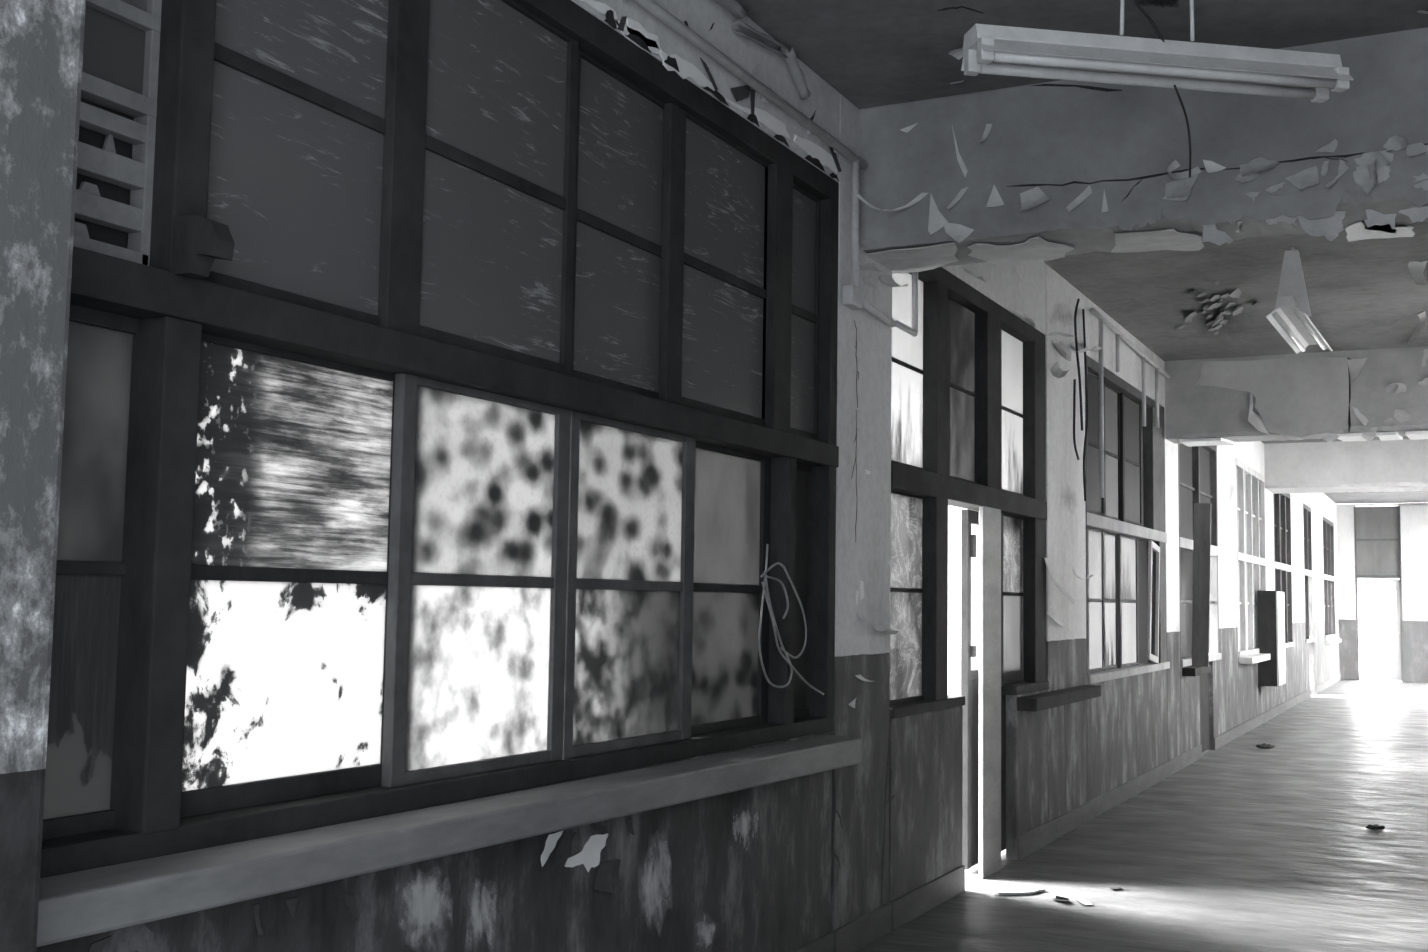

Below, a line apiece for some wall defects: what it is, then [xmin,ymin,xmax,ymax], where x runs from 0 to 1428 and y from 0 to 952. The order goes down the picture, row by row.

flaking render [579,0,842,182]
spalling [855,126,1074,287]
peeling [1066,185,1108,213]
crack [1006,167,1240,202]
spalling [1111,222,1242,253]
peeling [1162,135,1428,242]
crack [1278,143,1428,163]
peeling [1175,281,1259,335]
leakage [402,874,451,946]
leakage [467,882,496,946]
peeling [541,830,608,872]
leakage [643,843,670,916]